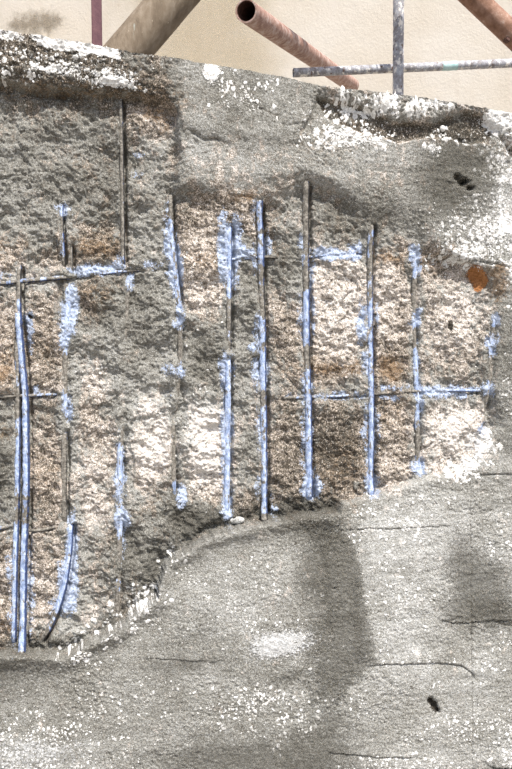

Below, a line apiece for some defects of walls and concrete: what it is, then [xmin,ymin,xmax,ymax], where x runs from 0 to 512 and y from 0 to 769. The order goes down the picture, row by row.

peeling [202,63,279,118]
peeling [370,491,456,572]
peeling [207,593,321,666]
peeling [0,685,130,769]